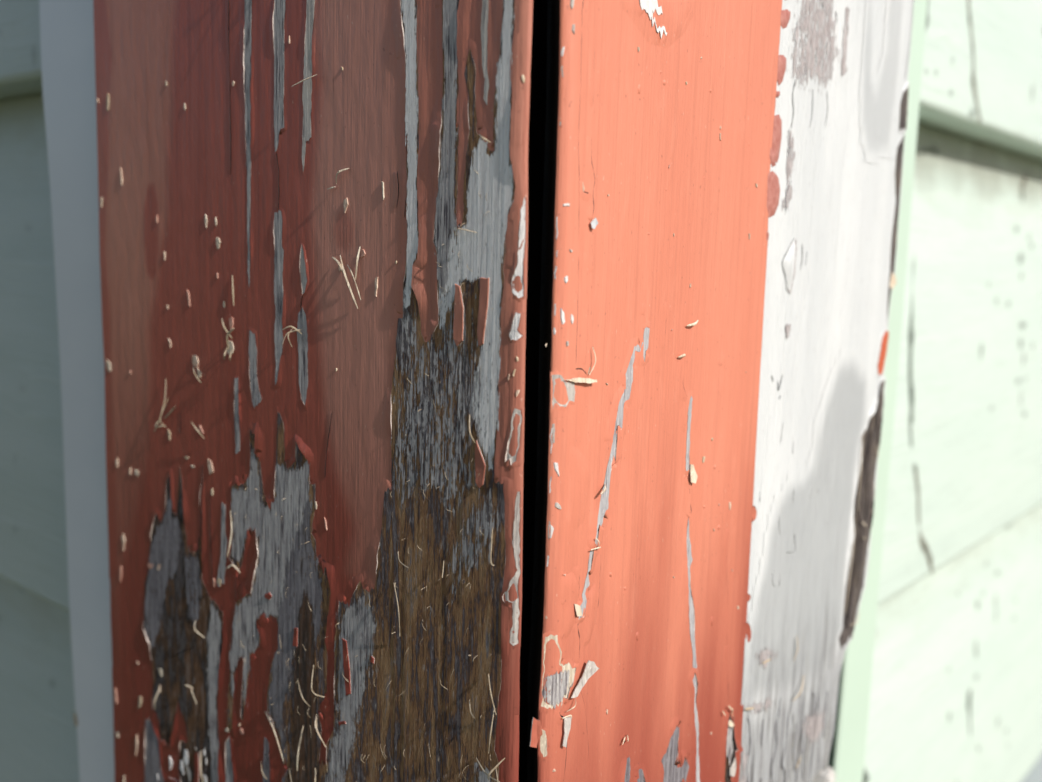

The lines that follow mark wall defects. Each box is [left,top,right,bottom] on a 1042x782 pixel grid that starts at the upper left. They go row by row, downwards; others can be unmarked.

peeling [135,0,533,782]
peeling [554,203,572,283]
peeling [530,304,652,782]
peeling [637,0,668,52]
peeling [618,382,743,782]
peeling [875,0,913,379]